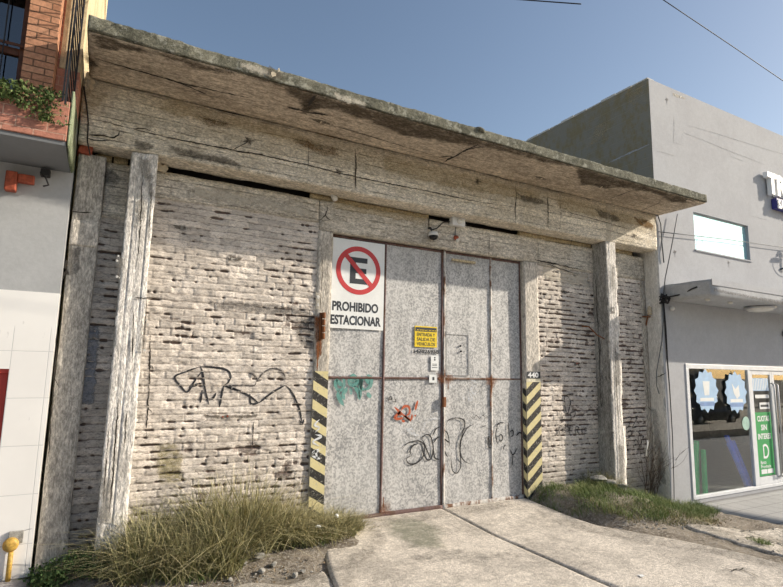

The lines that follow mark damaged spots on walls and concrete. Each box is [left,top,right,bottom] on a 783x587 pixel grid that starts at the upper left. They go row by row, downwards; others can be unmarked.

crack [80,116,517,222]
water stain [244,64,693,202]
rust [314,316,322,370]
crack [103,399,127,512]